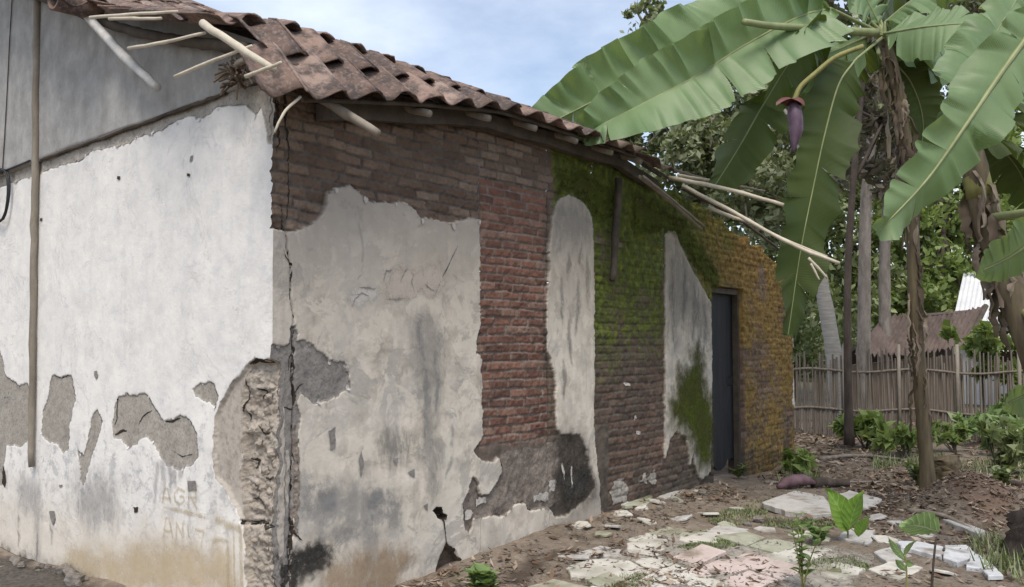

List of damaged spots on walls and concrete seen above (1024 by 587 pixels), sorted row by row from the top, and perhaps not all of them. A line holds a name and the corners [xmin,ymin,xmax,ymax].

peeling [0,353,198,491]
spalling [194,326,350,587]
crack [281,209,304,574]
spalling [424,503,462,572]
spalling [463,439,567,532]